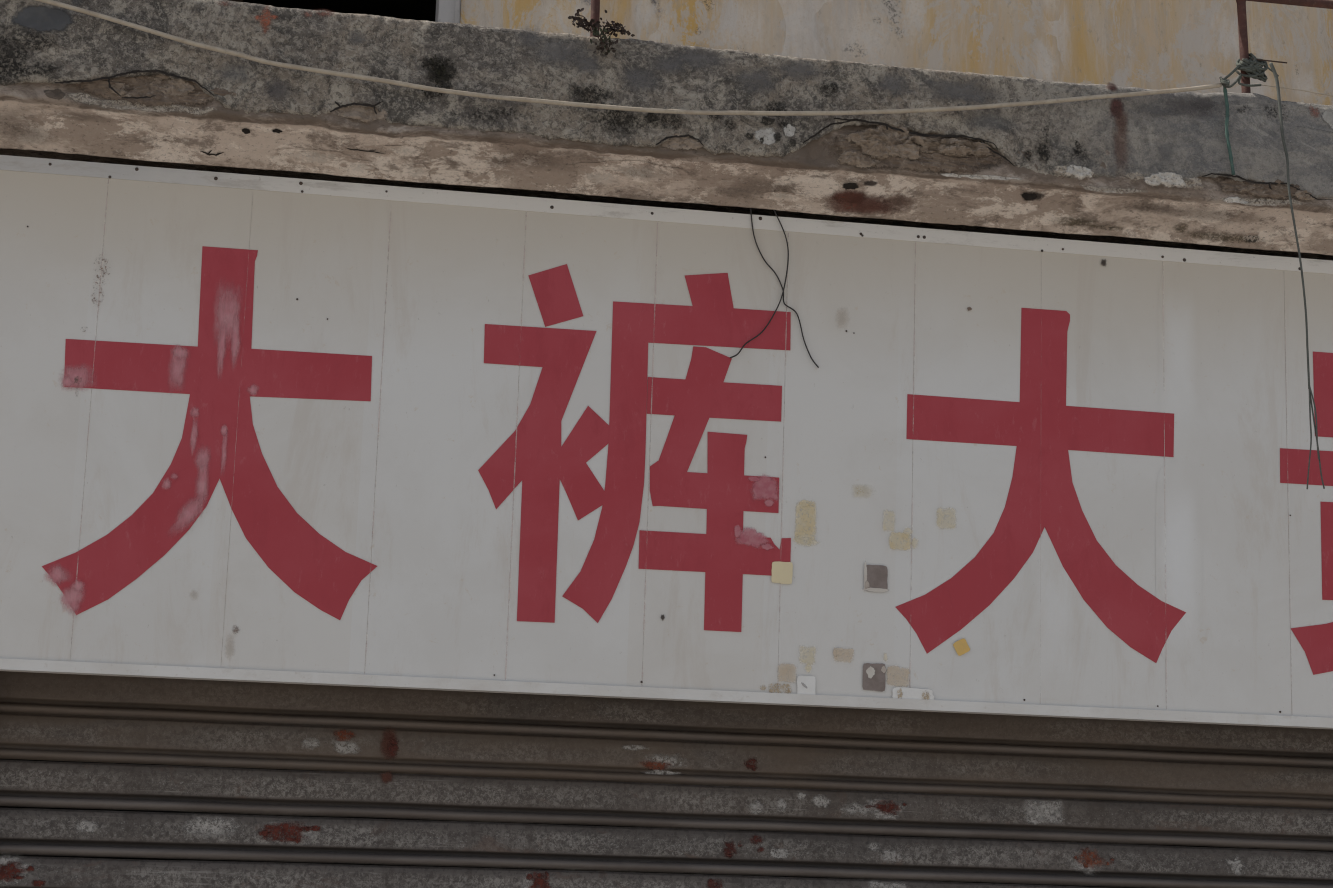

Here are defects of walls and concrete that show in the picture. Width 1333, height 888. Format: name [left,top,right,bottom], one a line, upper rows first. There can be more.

spalling [44,74,236,115]
corrosion [1106,83,1123,119]
spalling [823,125,1043,201]
corrosion [259,823,320,843]
corrosion [0,855,45,887]